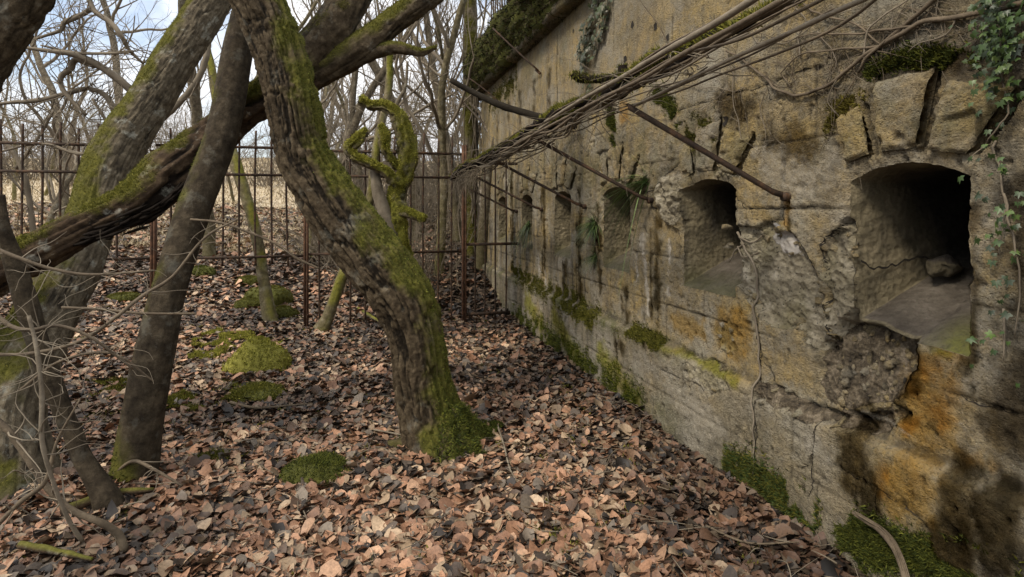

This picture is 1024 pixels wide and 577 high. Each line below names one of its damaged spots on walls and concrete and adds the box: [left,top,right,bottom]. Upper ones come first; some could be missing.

spalling [721,222,918,435]
crack [745,309,923,521]
leakage [930,450,1024,577]